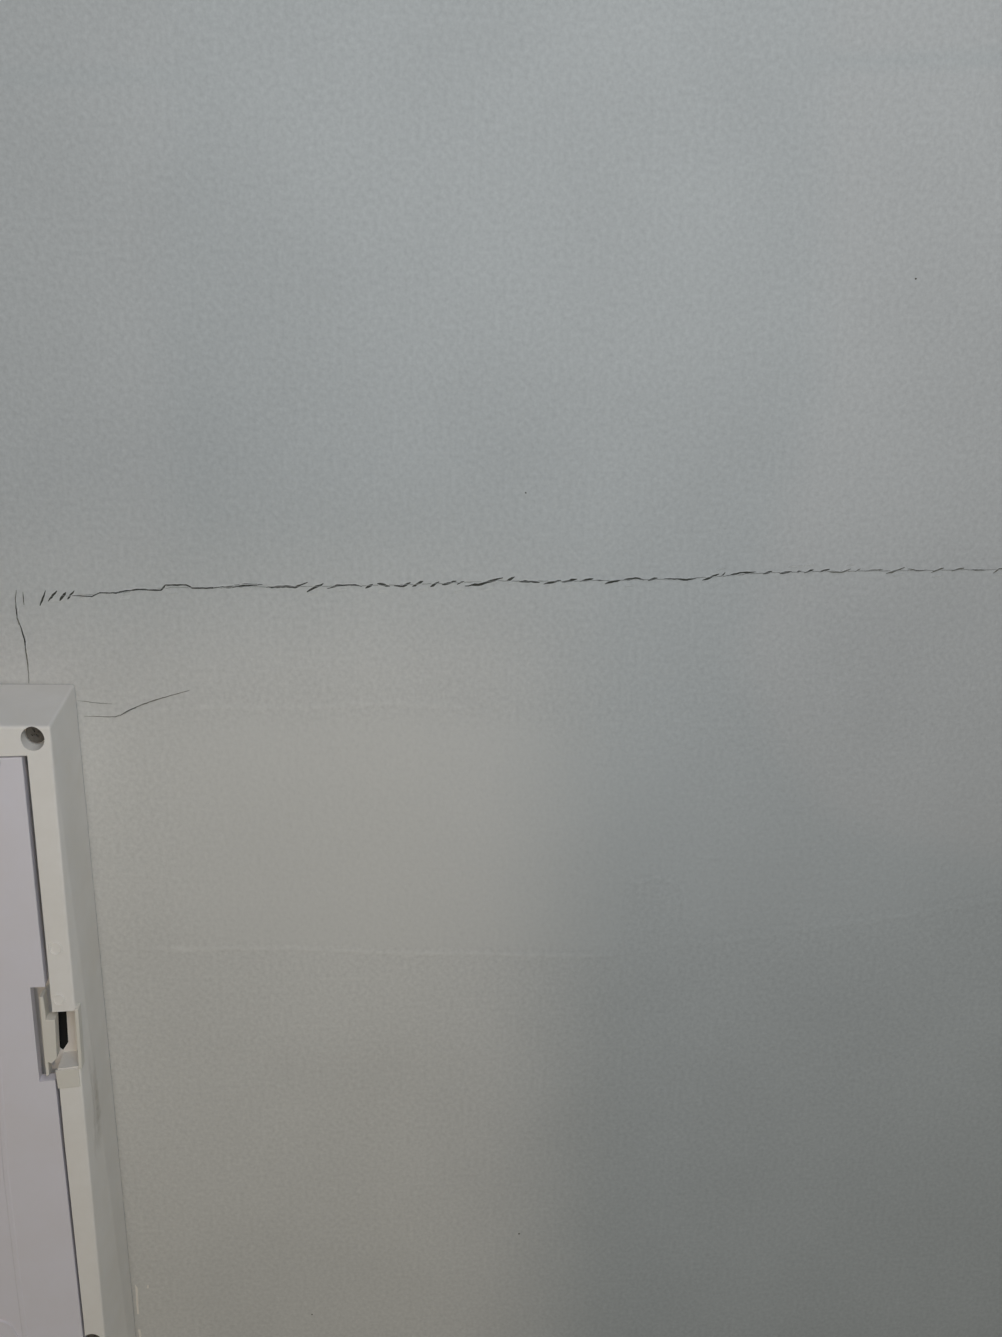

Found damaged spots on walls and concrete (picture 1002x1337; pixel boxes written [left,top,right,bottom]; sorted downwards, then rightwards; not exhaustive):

crack [14,564,1002,683]
crack [77,690,190,718]